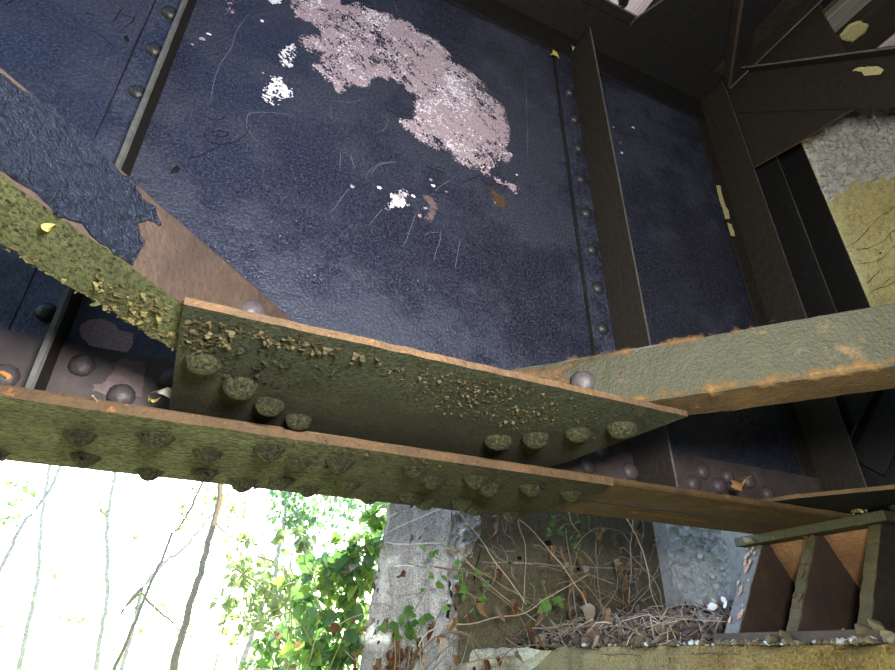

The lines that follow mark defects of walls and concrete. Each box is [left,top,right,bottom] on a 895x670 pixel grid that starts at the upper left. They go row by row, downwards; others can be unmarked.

peeling [261,0,520,208]
spalling [803,107,895,201]
peeling [377,179,438,223]
crack [849,206,895,294]
peeling [79,318,145,397]